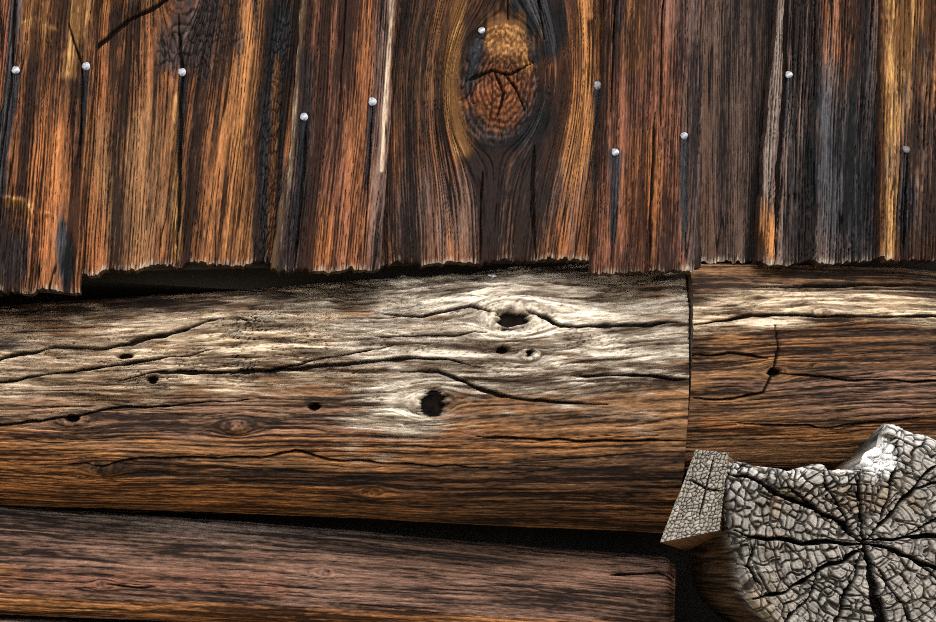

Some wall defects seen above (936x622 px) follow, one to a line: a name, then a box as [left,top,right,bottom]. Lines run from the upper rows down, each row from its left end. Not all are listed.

crack [69,0,168,154]
crack [176,32,184,247]